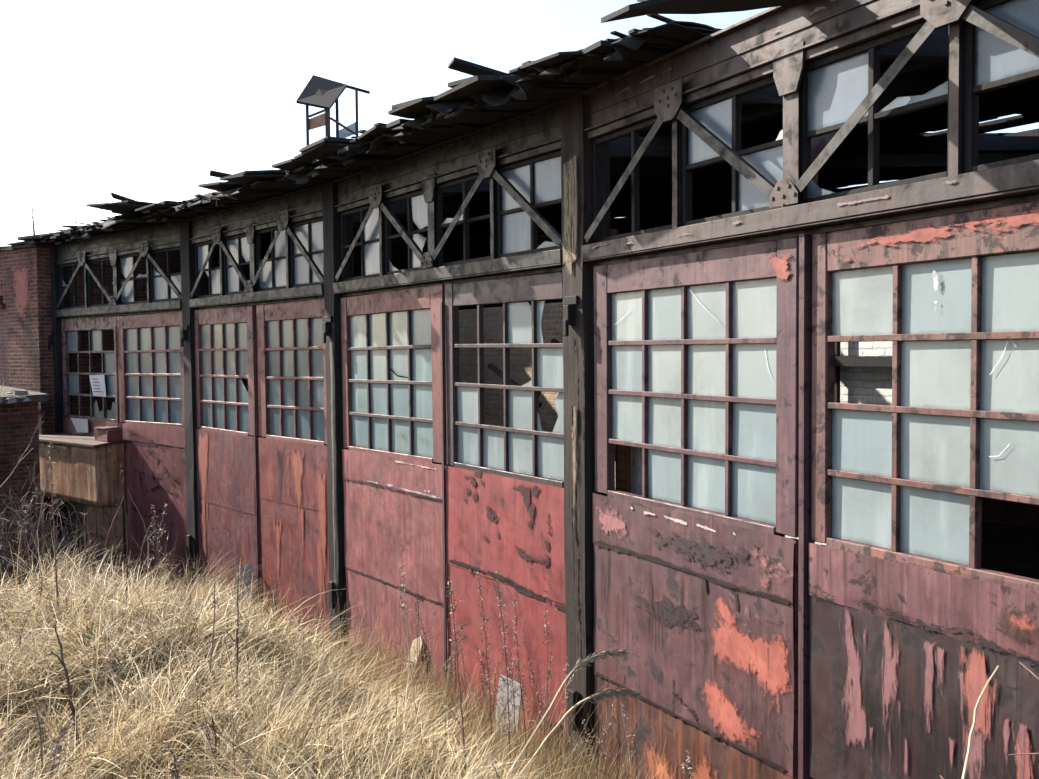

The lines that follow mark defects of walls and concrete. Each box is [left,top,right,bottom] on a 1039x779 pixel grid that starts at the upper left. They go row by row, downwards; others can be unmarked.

peeling [767,253,790,280]
peeling [844,207,1039,261]
peeling [634,574,793,711]
peeling [705,681,758,750]
peeling [839,609,900,763]
peeling [924,641,944,732]
peeling [949,643,997,779]
peeling [1003,719,1035,779]